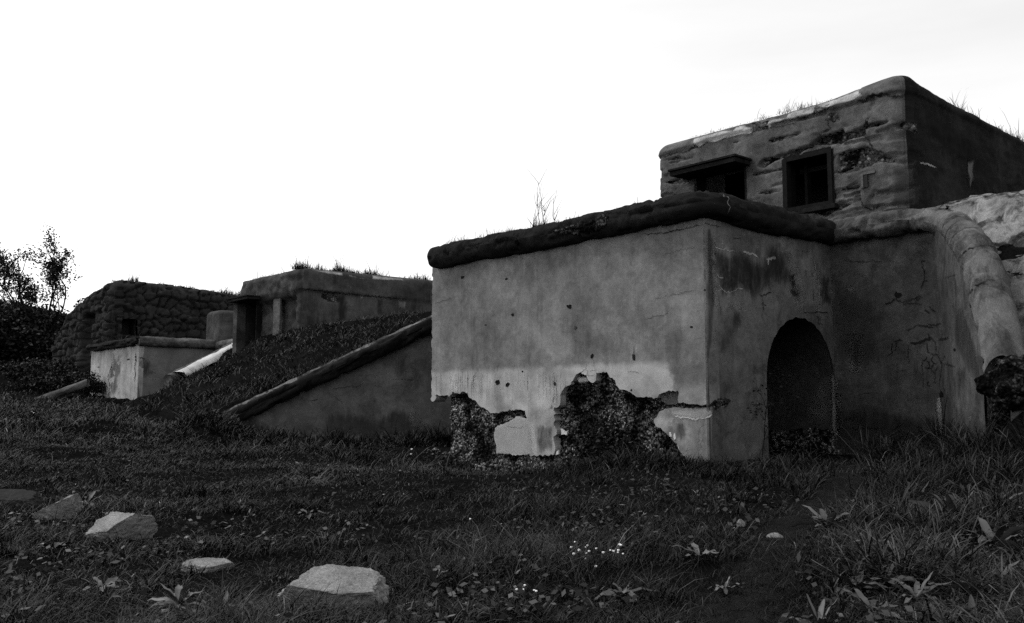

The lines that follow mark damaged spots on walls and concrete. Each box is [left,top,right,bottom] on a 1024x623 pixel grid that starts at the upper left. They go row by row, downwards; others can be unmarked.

water stain [708,230,829,305]
crack [886,191,1024,386]
spalling [449,373,728,469]